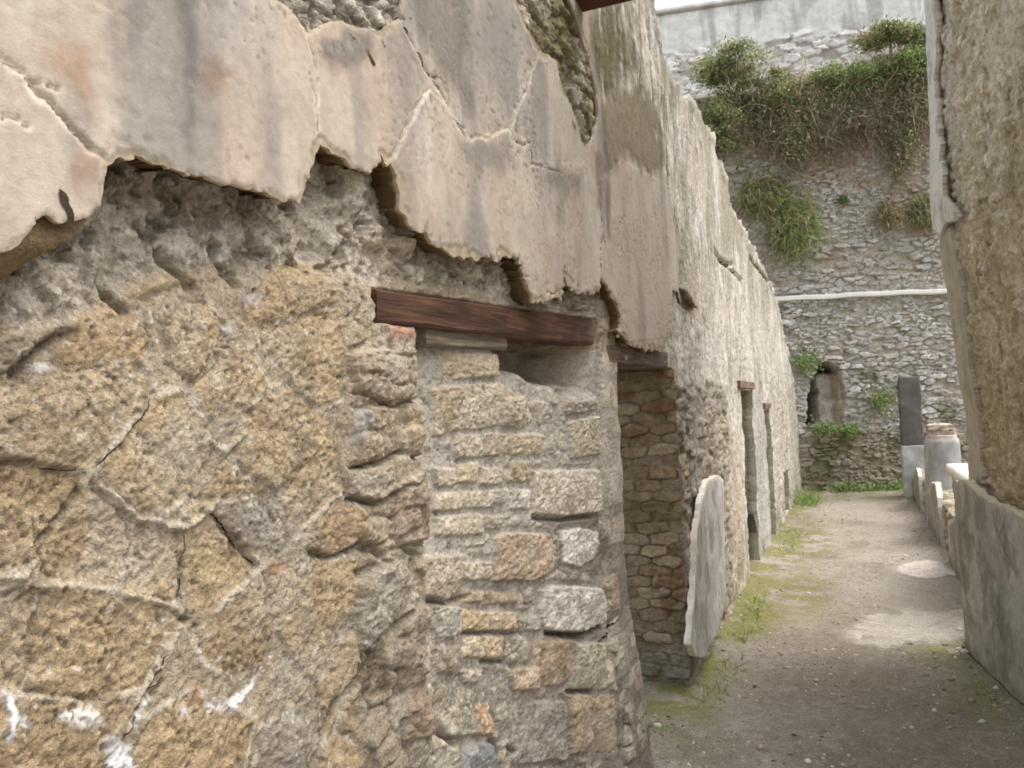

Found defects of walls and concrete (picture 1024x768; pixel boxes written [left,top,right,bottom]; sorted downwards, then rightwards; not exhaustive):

crack [0,60,99,155]
crack [392,27,561,171]
spalling [59,189,75,227]
crack [39,396,150,474]
crack [176,529,187,598]
crack [210,513,255,566]
damp [5,693,28,740]
damp [57,707,100,726]
damp [206,676,256,712]
damp [104,737,135,768]